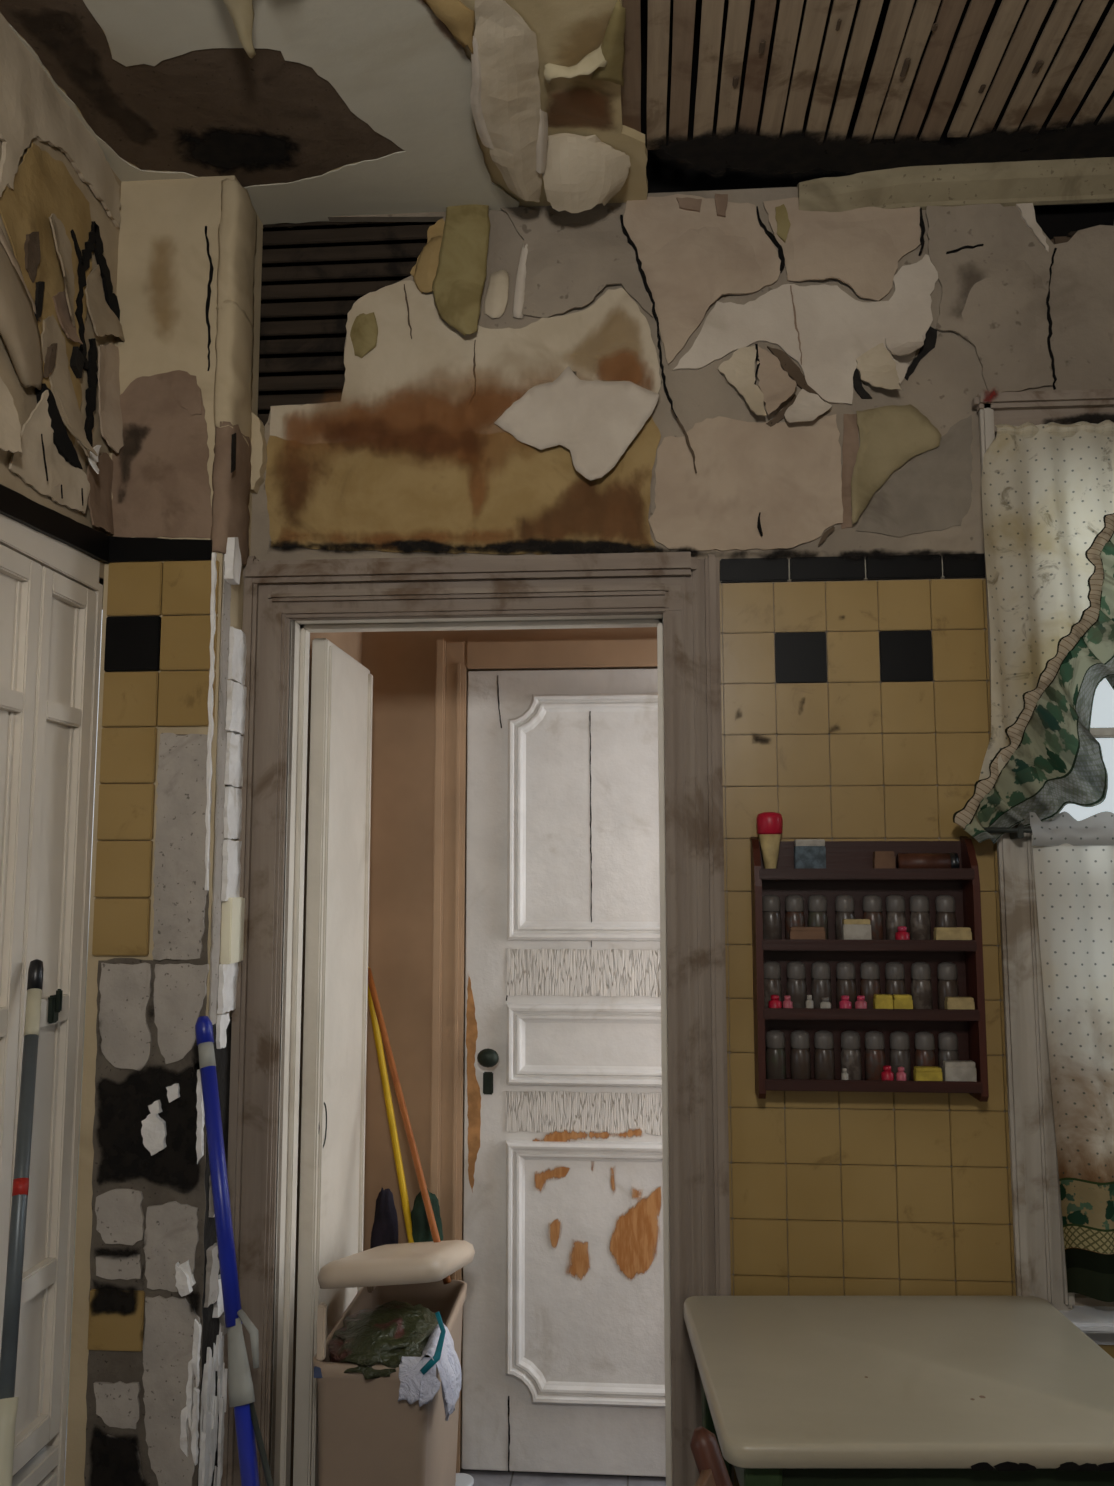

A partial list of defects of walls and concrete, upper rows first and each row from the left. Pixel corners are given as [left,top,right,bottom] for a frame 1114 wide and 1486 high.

crack [756,206,785,273]
crack [918,208,984,256]
crack [620,214,677,419]
crack [1046,248,1057,390]
spalling [258,204,973,555]
spalling [0,0,405,1486]
peeling [535,1167,570,1192]
peeling [533,1129,642,1142]
peeling [550,1219,590,1280]
peeling [610,1187,661,1279]